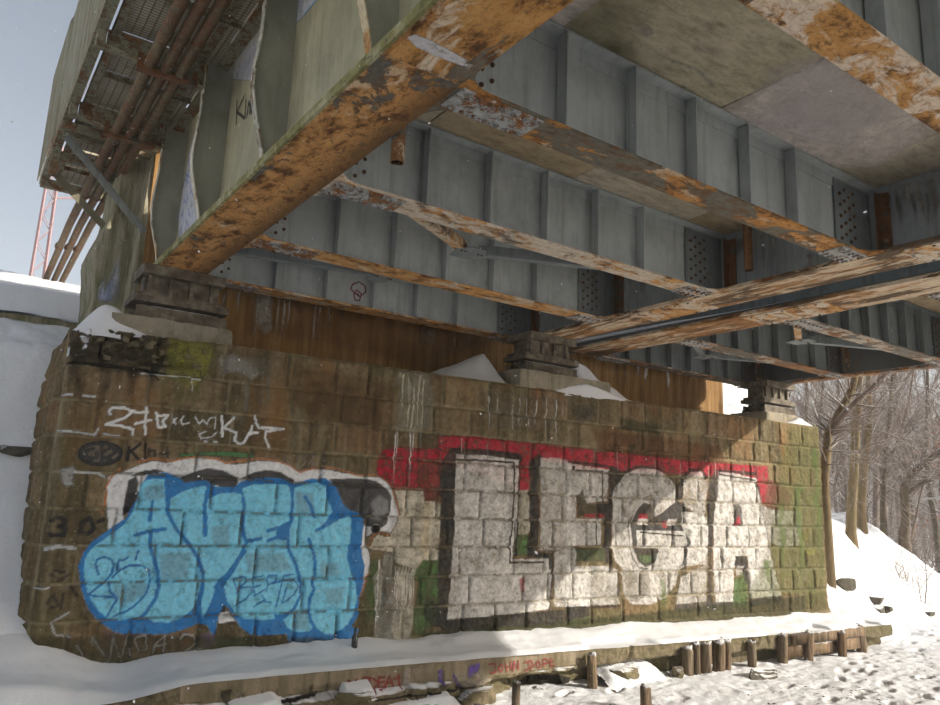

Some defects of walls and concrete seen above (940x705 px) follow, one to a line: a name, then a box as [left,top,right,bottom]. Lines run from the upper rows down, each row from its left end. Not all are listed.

spalling [80,335,174,366]
leakage [393,372,434,465]
leakage [511,398,563,431]